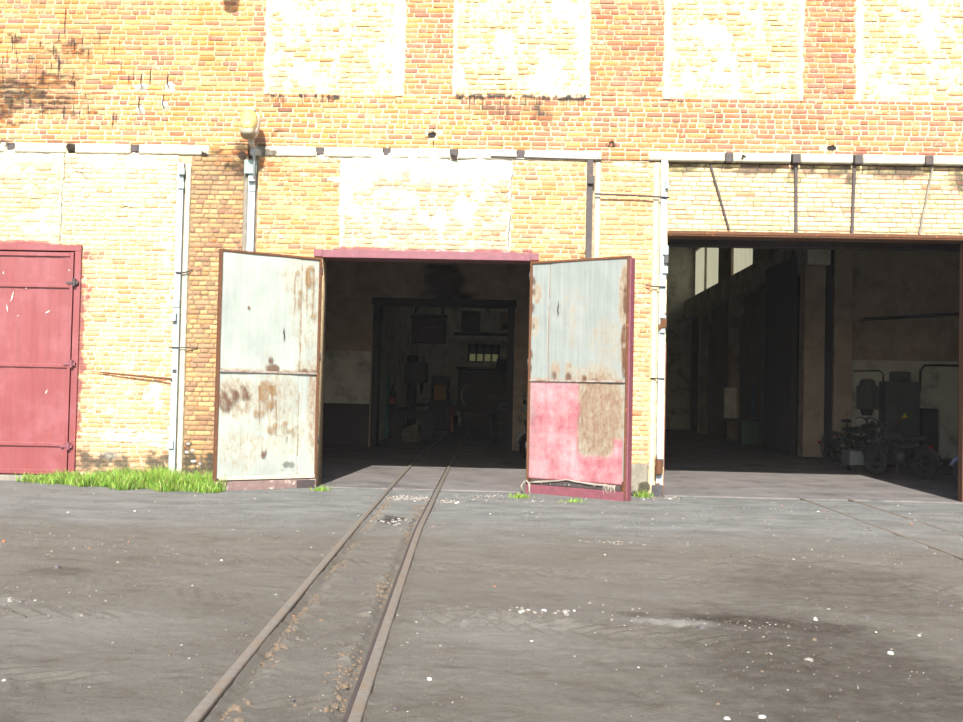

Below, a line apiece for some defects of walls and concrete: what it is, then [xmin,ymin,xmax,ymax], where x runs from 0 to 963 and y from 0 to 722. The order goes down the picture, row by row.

corrosion [267,358,317,373]
corrosion [220,383,275,415]